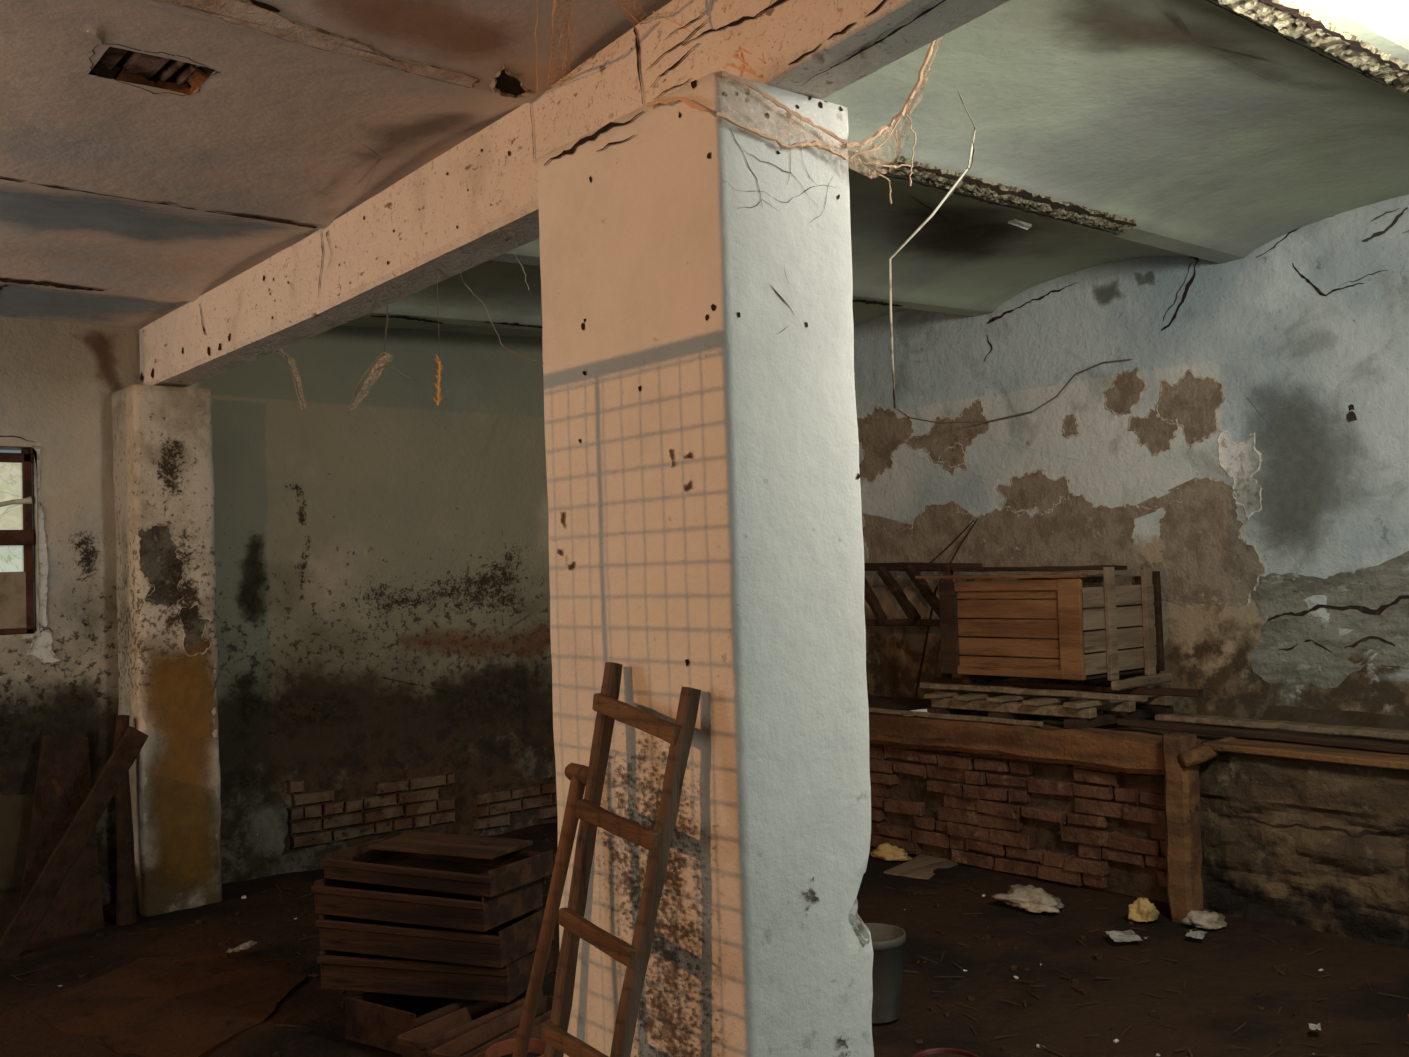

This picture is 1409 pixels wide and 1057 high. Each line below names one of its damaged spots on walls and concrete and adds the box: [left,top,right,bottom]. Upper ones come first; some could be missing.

flaking render [88,44,221,96]
crack [530,27,644,166]
crack [682,0,785,46]
spalling [1206,0,1409,93]
crack [0,177,331,294]
spalling [879,156,1137,235]
damp [1252,396,1341,547]
damp [238,536,267,620]
flaking render [857,366,1409,689]
crack [1268,595,1409,652]
damp [596,831,648,939]
damp [630,766,721,1057]